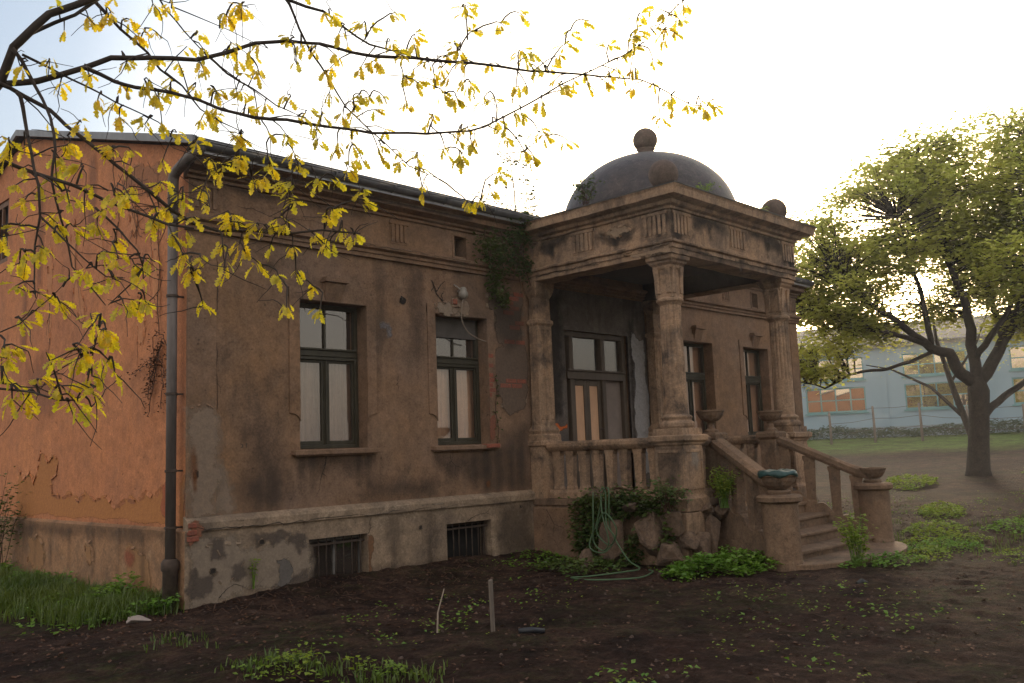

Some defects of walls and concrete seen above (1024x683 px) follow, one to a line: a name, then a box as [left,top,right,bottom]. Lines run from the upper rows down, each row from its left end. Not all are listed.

peeling [631,333,650,474]
peeling [16,451,165,524]
spalling [185,403,312,609]